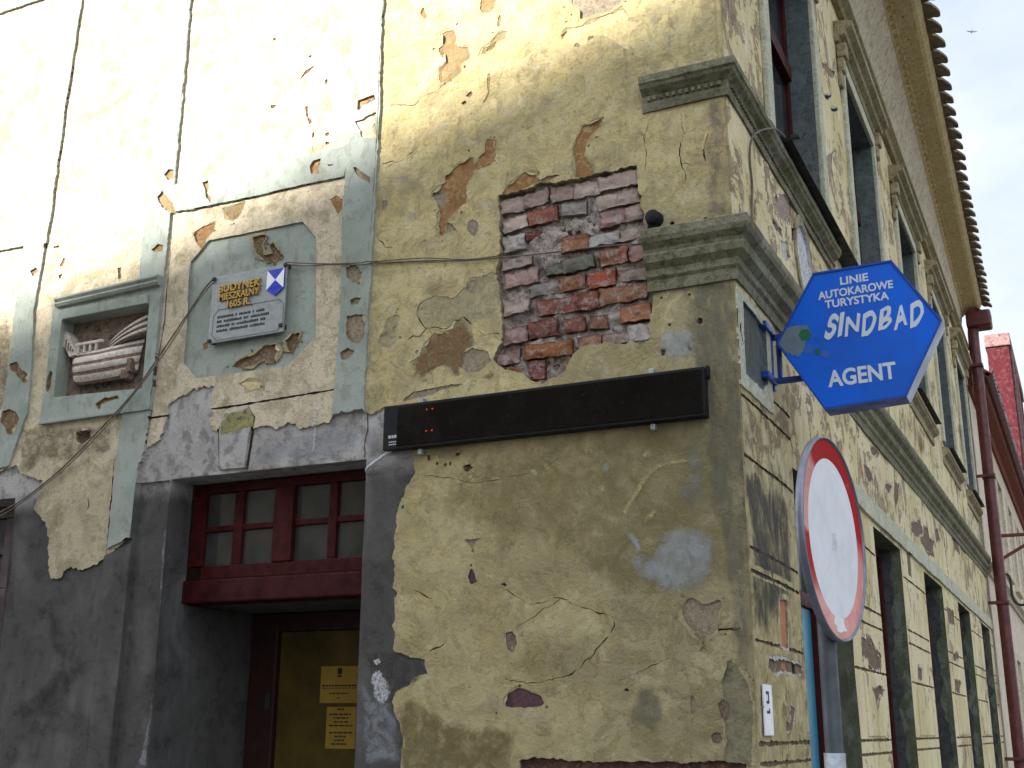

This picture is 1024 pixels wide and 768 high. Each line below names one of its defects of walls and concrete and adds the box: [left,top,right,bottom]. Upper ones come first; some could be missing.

peeling [432,0,507,85]
peeling [250,232,284,265]
flaking render [403,117,655,402]
peeling [226,330,303,393]
flaking render [76,429,91,444]
peeling [95,395,119,409]
peeling [906,520,960,578]
peeling [495,684,548,714]
crack [488,577,615,684]
flaking render [519,658,764,768]
flaking render [768,597,803,677]
peeling [861,551,909,768]